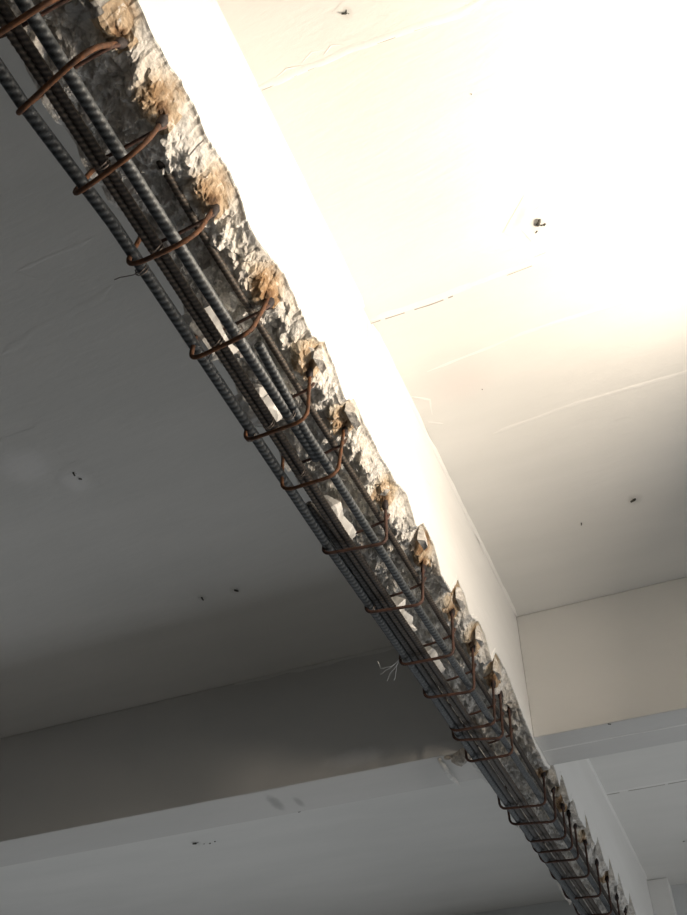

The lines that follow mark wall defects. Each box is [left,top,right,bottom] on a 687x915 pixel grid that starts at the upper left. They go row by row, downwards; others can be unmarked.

spalling [0,58,28,108]
spalling [0,0,90,90]
spalling [22,54,137,189]
rust [59,0,200,159]
rust [157,139,246,246]
spalling [82,123,636,915]
rust [389,524,506,695]
rust [531,767,569,813]